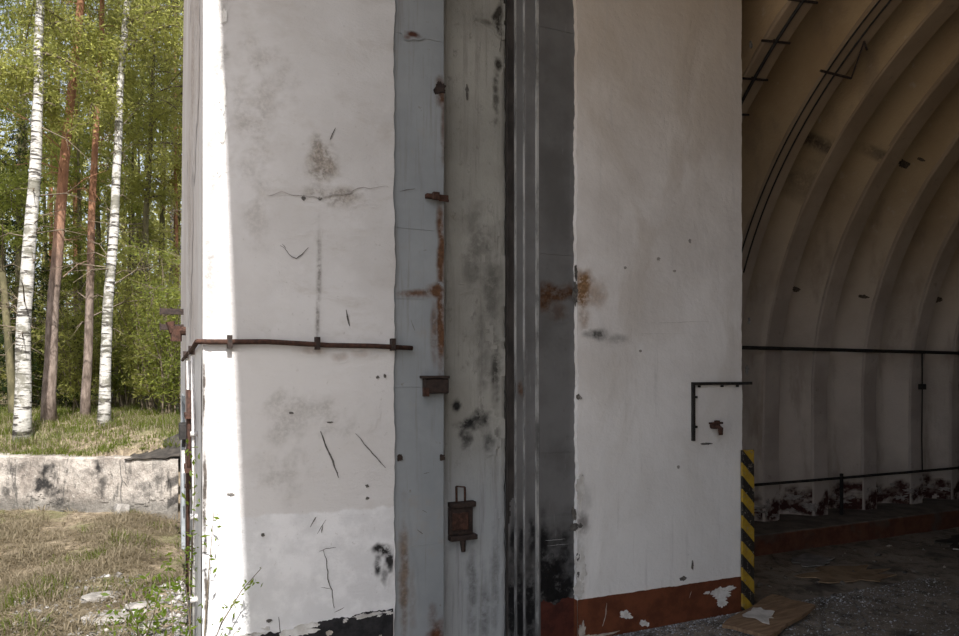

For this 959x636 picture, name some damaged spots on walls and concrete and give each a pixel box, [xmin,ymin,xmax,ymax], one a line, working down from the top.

spalling [195,0,233,636]
water stain [221,4,306,258]
water stain [295,127,369,340]
crack [269,186,412,198]
corrosion [394,193,444,379]
water stain [449,185,505,458]
corrosion [540,265,610,331]
peeling [233,619,333,636]
peeling [343,610,394,623]
corrosion [395,487,444,636]
water stain [462,482,595,636]
peeling [703,585,737,608]